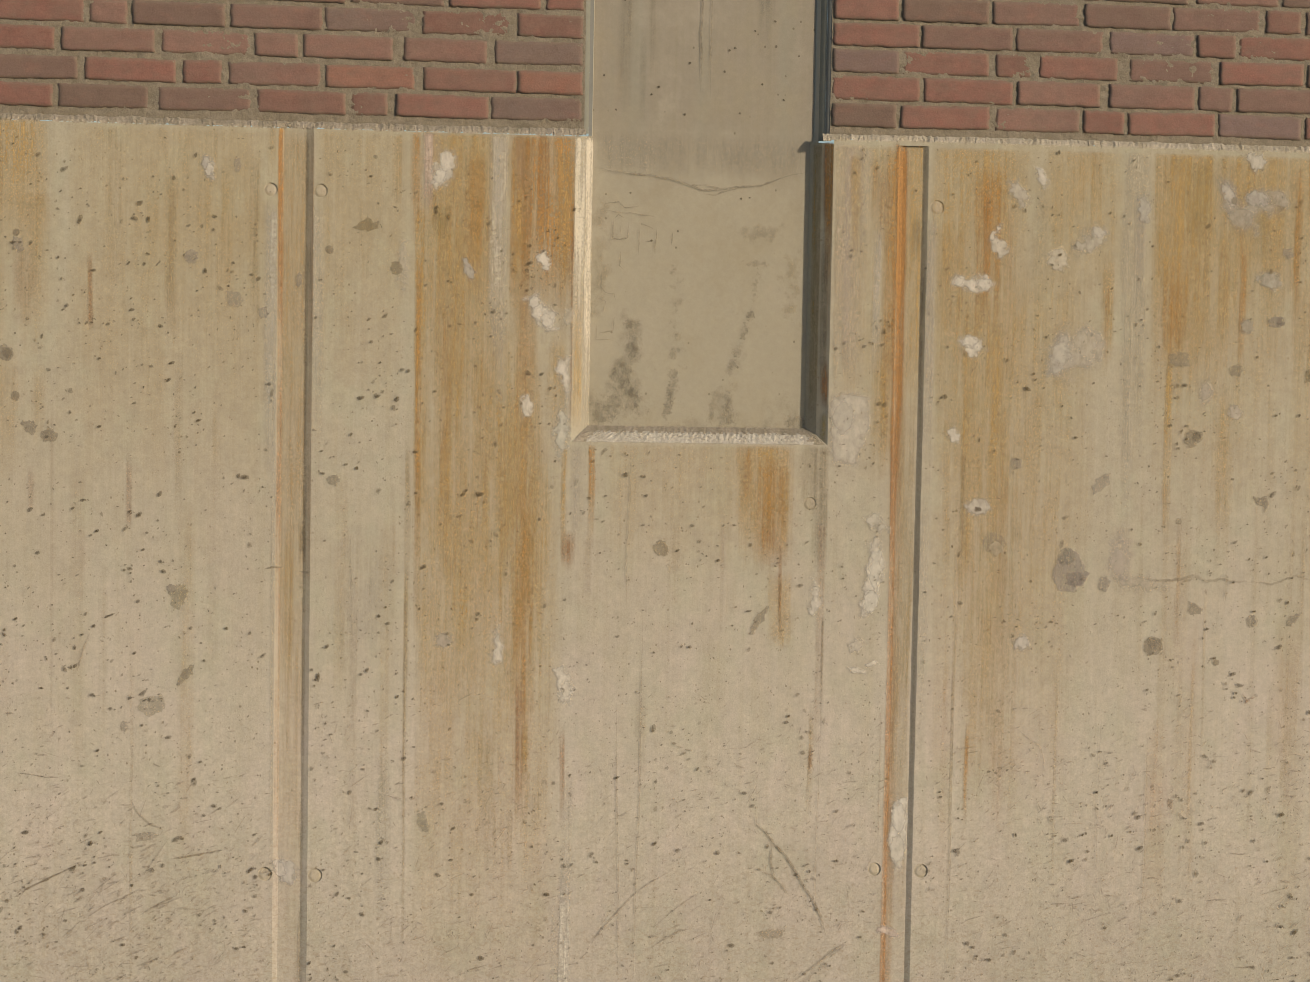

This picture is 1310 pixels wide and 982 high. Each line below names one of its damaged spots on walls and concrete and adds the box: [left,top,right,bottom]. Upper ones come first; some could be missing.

peeling [1247,152,1266,172]
rust [511,138,574,276]
peeling [1222,181,1289,230]
rust [415,179,425,501]
peeling [525,294,555,331]
rust [880,146,923,559]
peeling [1049,328,1104,375]
peeling [830,394,869,464]
peeling [860,514,885,616]
peeling [889,798,908,870]